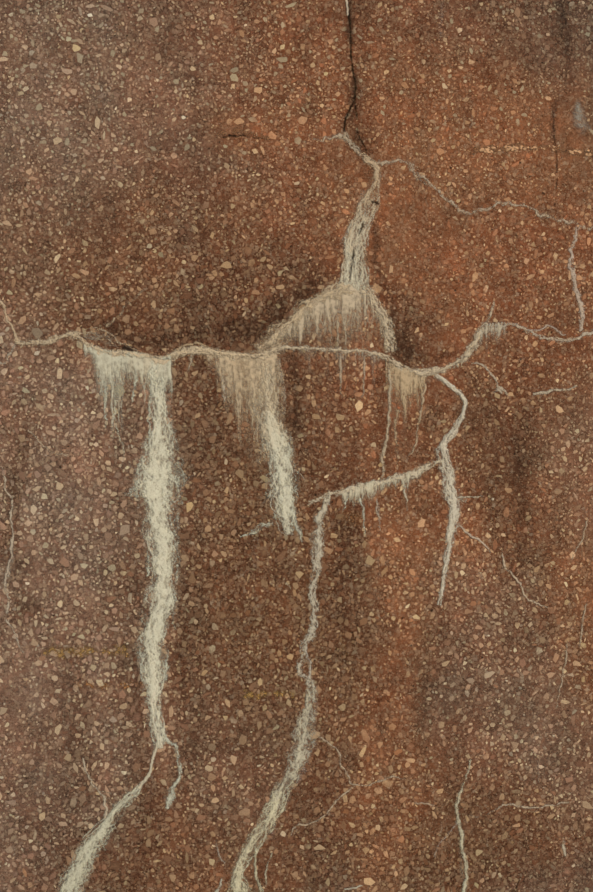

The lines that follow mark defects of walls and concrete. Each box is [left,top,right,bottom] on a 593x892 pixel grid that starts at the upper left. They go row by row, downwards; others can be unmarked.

crack [0,0,593,395]
crack [2,467,24,653]
water stain [60,337,185,892]
water stain [207,153,490,892]
crack [502,553,546,607]
crack [556,604,587,708]
crack [291,737,399,835]
crack [494,802,568,811]